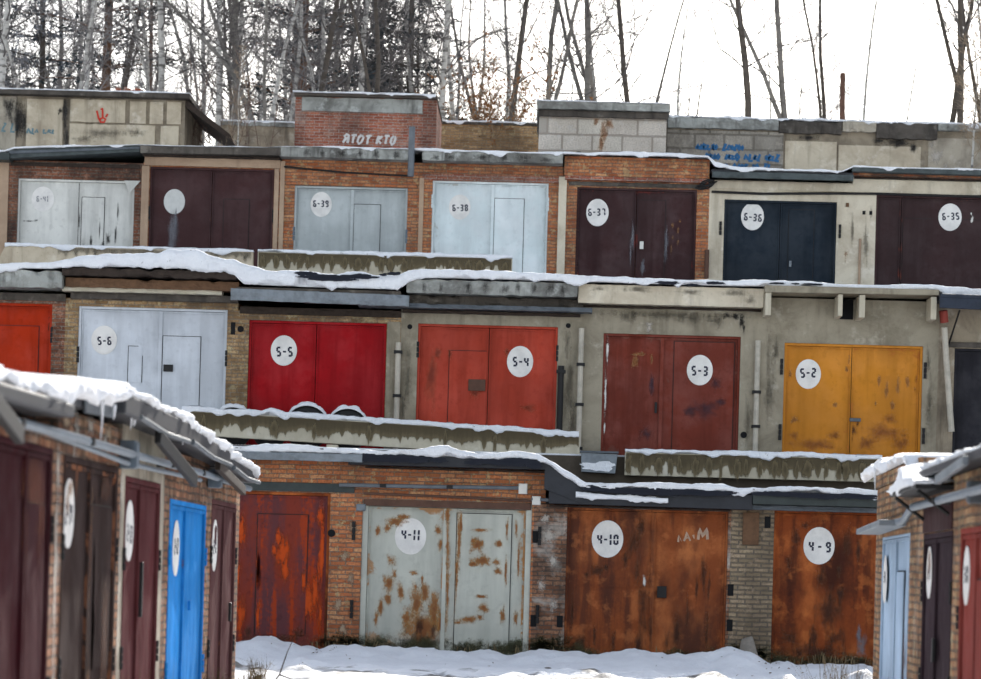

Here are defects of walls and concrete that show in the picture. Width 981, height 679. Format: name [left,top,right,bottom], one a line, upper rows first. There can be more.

damp [190,404,579,453]
damp [625,453,877,481]
corrosion [374,508,520,647]
corrosion [623,523,652,650]
corrosion [785,571,845,659]